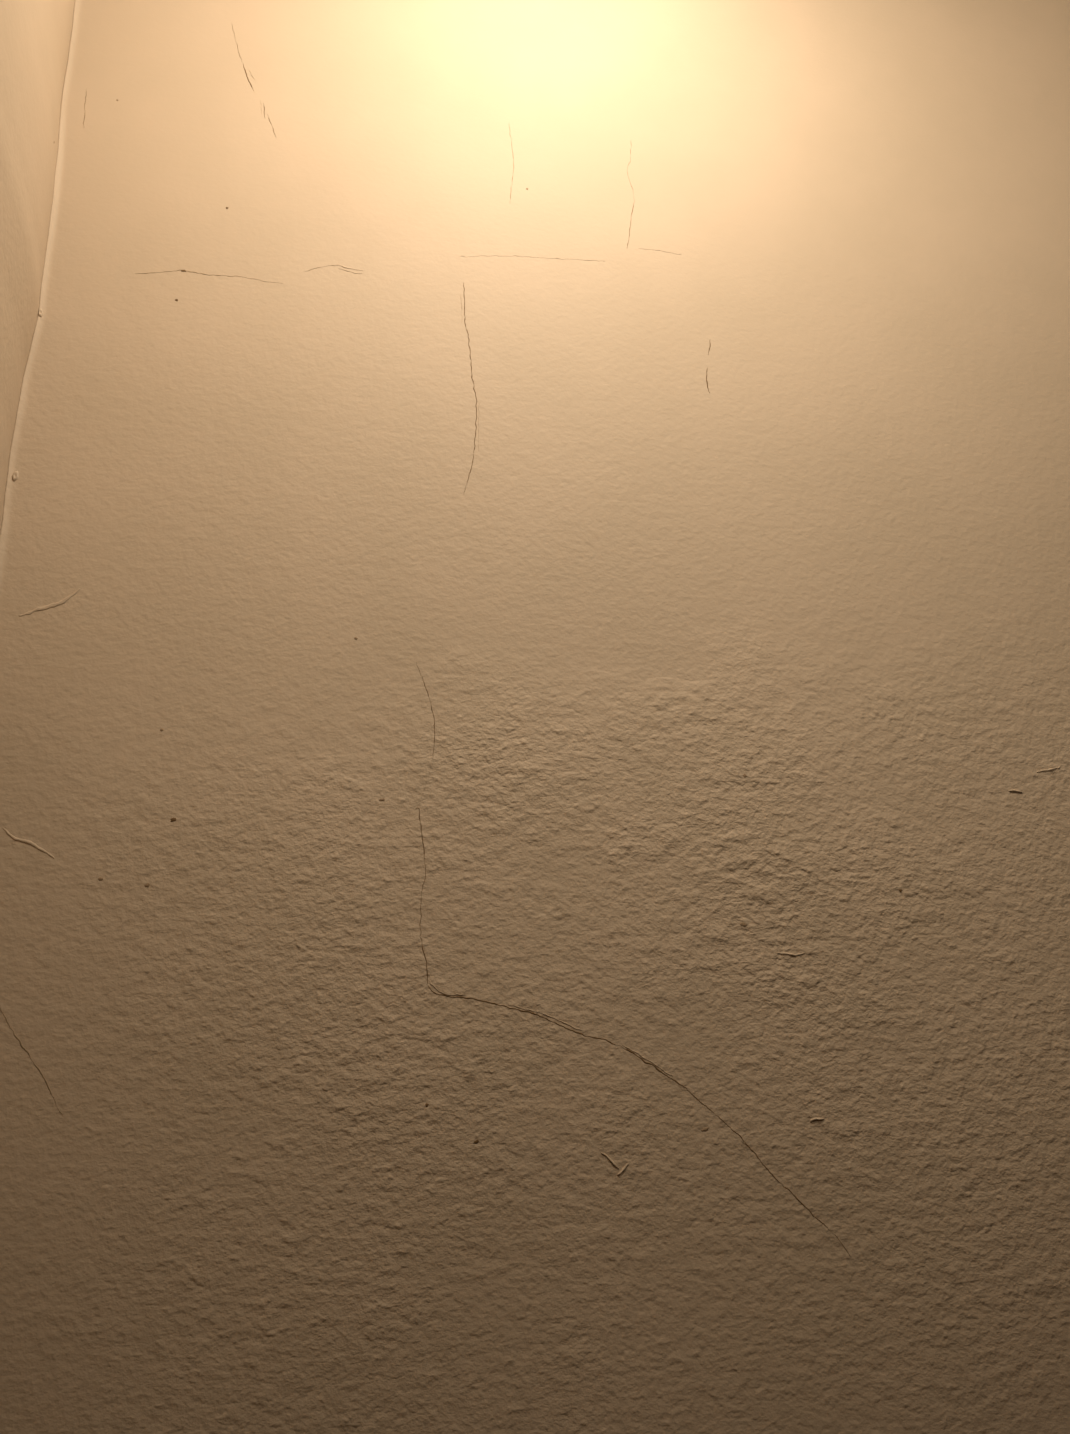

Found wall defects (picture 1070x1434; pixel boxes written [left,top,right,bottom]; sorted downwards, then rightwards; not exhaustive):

crack [308,264,364,274]
crack [461,146,681,488]
crack [416,666,851,1257]